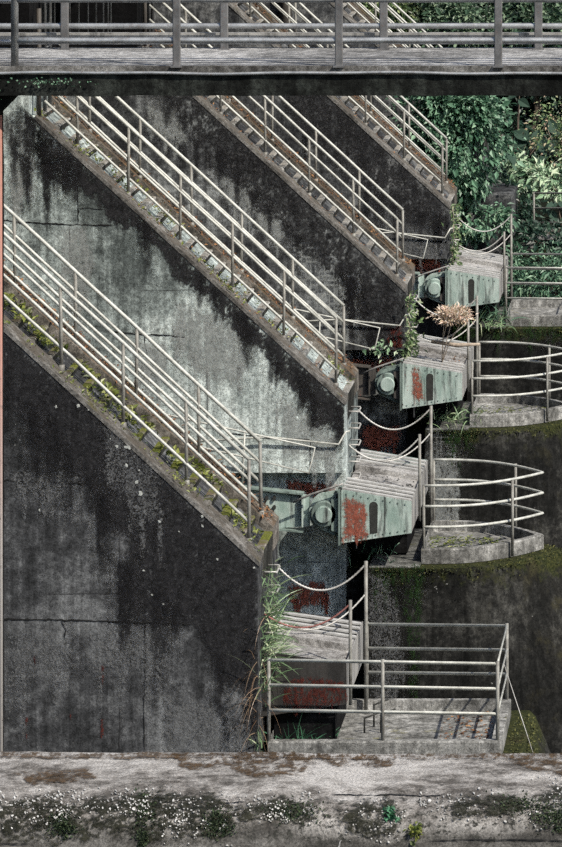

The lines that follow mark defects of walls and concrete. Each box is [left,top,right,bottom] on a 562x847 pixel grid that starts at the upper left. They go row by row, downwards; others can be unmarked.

damp [6,107,344,487]
corrosion [412,367,423,402]
corrosion [360,424,401,454]
damp [4,332,258,753]
corrosion [342,498,370,545]
corrosion [288,581,329,614]
damp [370,576,417,698]
crack [4,618,193,748]
corrosion [283,677,348,709]